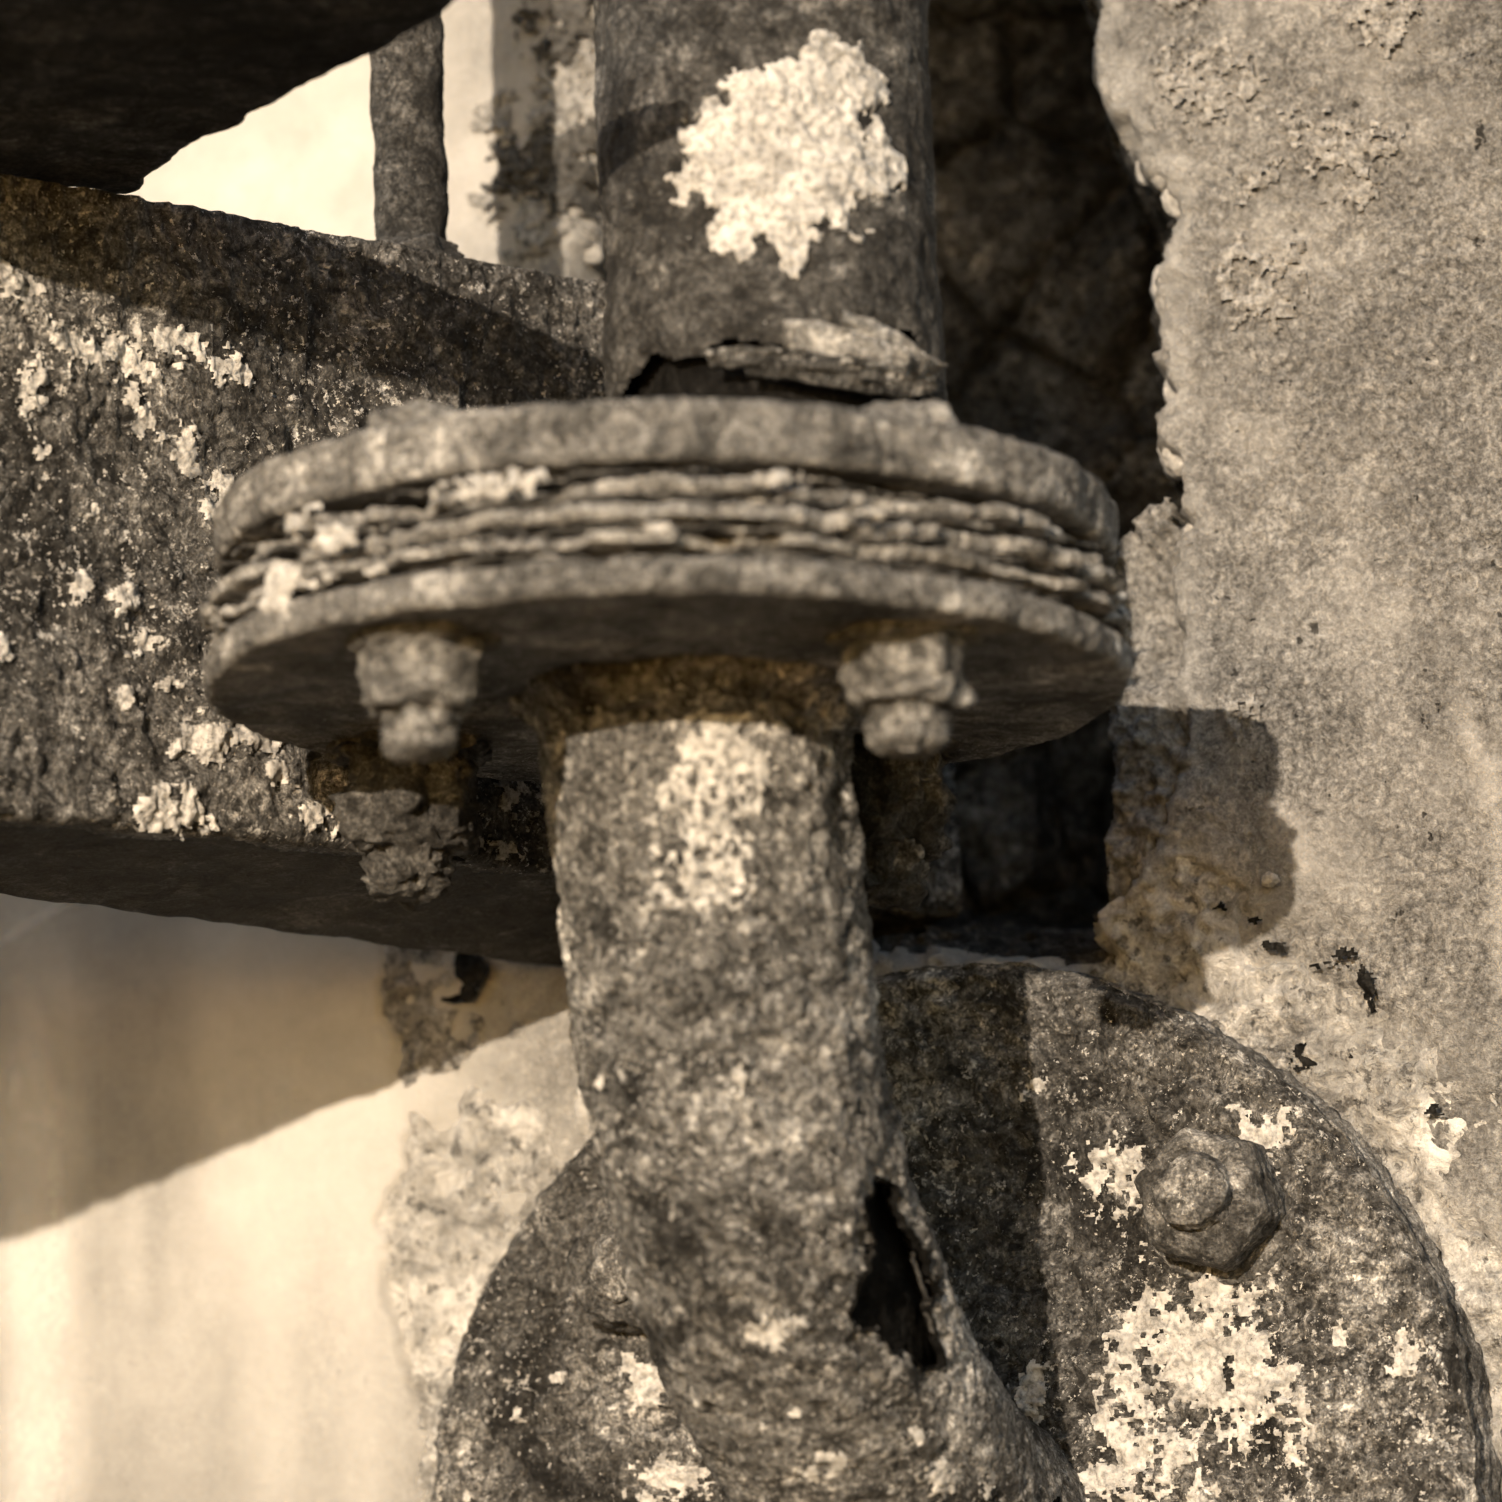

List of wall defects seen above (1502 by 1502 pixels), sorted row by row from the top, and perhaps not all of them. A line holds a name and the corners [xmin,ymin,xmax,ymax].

corrosion [706,311,948,400]
spalling [872,0,1502,1460]